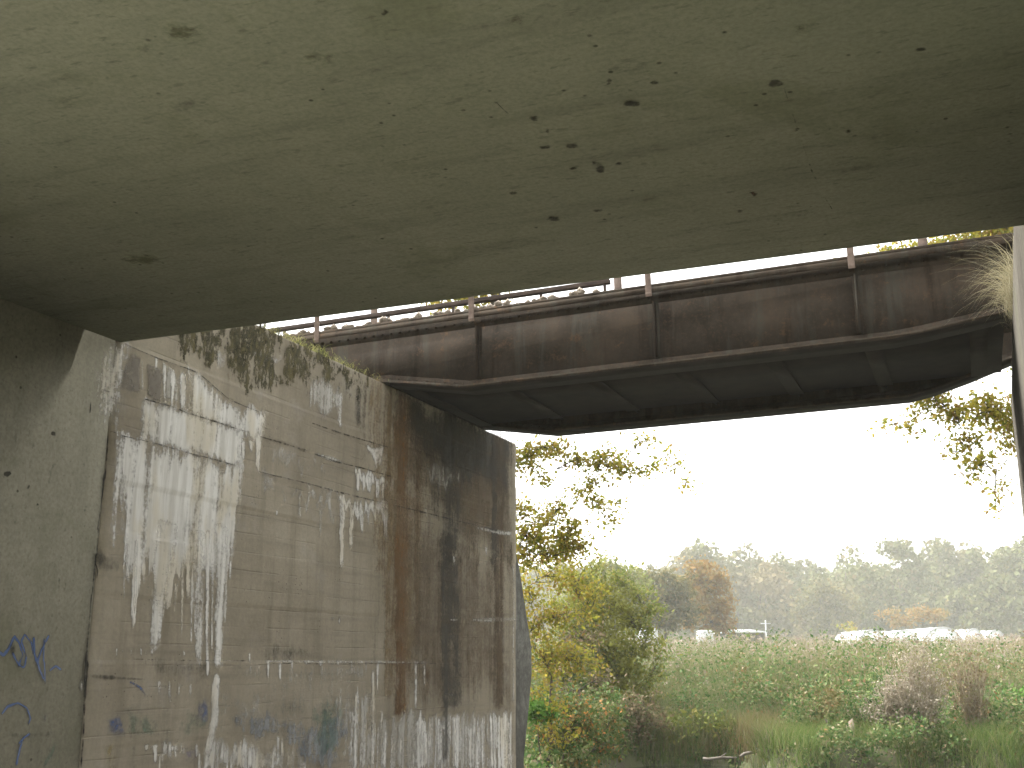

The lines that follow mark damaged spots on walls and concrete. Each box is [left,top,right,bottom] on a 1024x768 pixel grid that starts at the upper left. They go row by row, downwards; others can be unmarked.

damp [98,345,128,416]
damp [113,358,306,768]
damp [267,397,514,768]